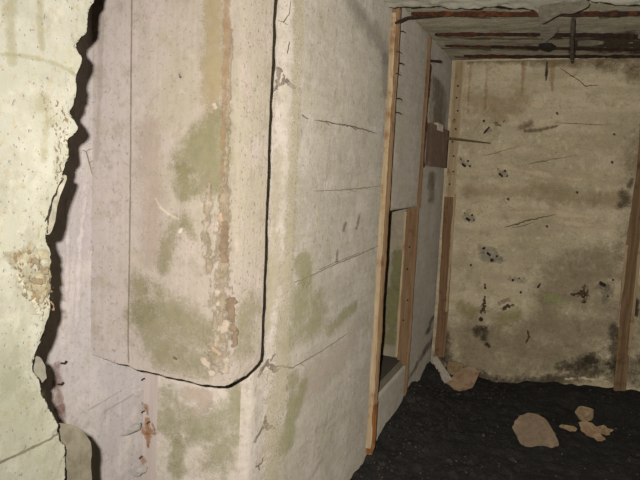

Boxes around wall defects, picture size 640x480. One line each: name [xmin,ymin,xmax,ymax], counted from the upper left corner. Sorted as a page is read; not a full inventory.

spalling [403,0,640,64]
crack [302,114,377,134]
crack [45,178,64,233]
spalling [200,29,239,377]
crack [504,214,555,228]
spalling [5,243,55,321]
crack [295,246,377,284]
crack [272,334,347,371]
damp [473,326,491,347]
damp [478,356,604,383]
rust [142,418,156,448]